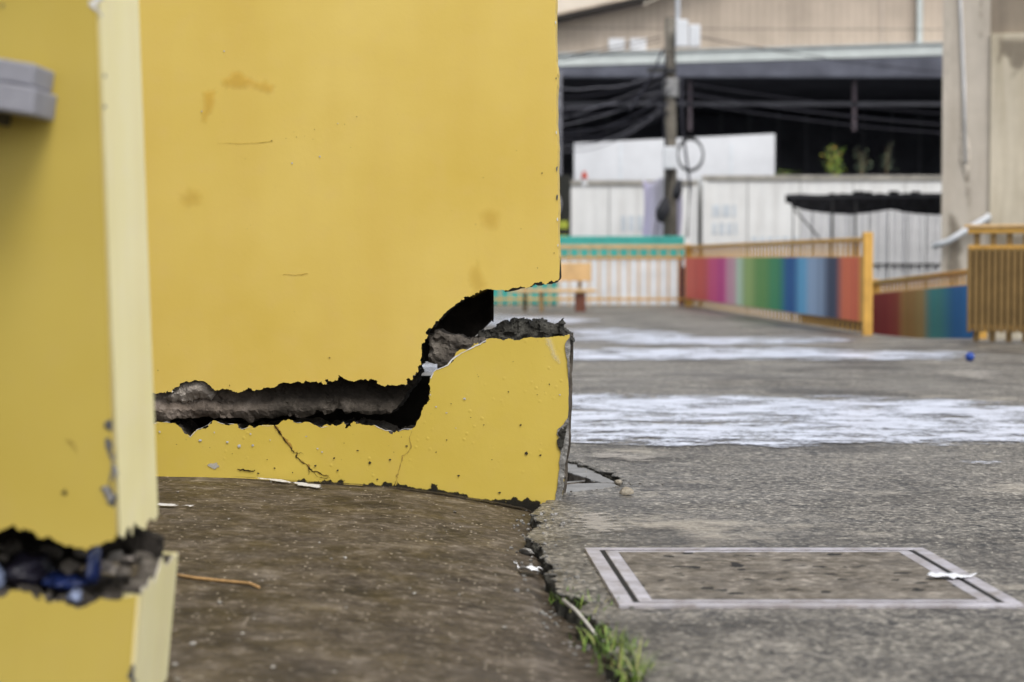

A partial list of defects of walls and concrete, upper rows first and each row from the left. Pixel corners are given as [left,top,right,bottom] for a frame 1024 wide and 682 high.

crack [153,369,424,479]
crack [0,525,165,577]